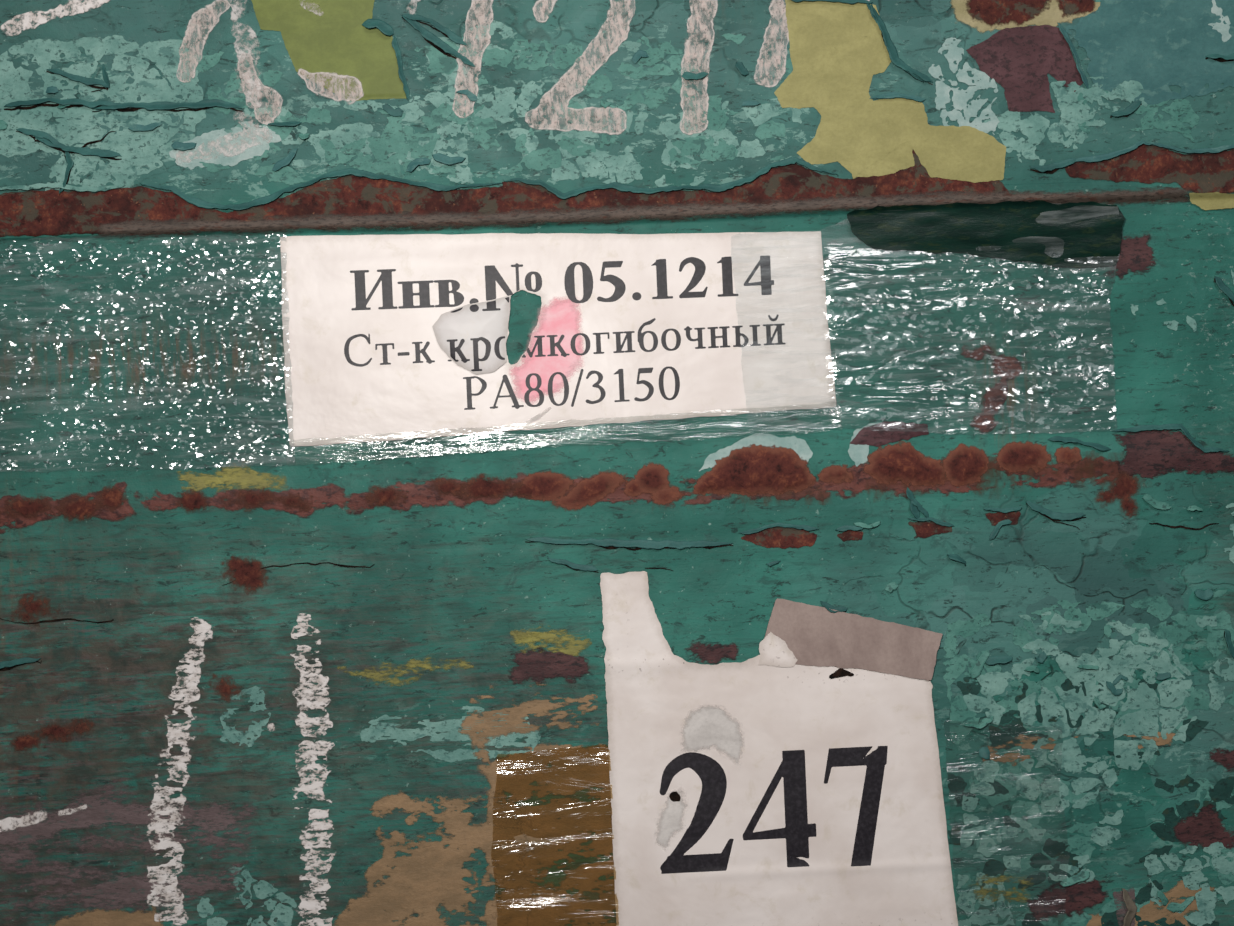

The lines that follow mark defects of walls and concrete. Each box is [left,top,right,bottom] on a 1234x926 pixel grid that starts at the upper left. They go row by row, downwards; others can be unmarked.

rust [966,0,1095,26]
peeling [1208,0,1231,42]
peeling [0,0,1200,191]
rust [0,150,1009,237]
rust [1064,140,1234,193]
rust [961,345,1023,433]
rust [0,421,1234,534]
peeling [1224,503,1234,563]
peeling [220,686,271,747]
peeling [943,590,1234,926]
peeling [335,682,616,926]
peeling [0,780,297,926]